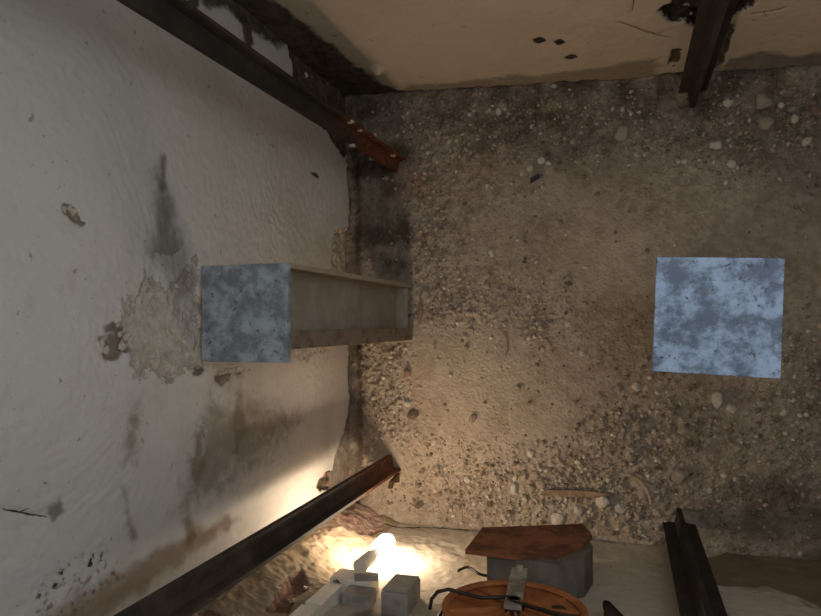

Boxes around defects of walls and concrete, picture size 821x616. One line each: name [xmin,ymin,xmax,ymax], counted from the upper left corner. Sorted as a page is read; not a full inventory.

spalling [658,0,700,27]
spalling [734,0,755,14]
spalling [287,45,347,116]
spalling [326,130,348,169]
damp [155,185,179,257]
peeling [98,254,205,385]